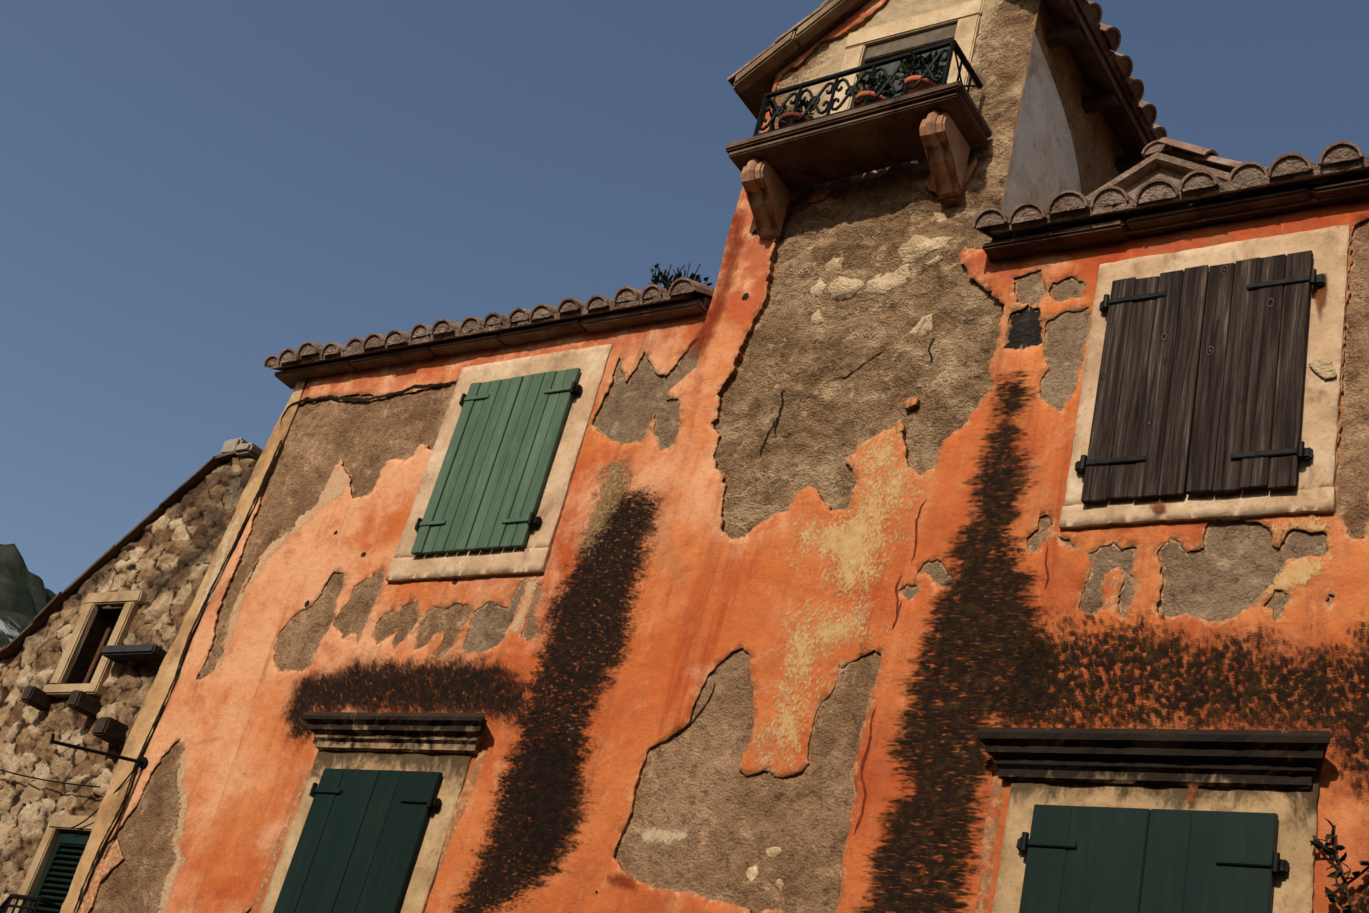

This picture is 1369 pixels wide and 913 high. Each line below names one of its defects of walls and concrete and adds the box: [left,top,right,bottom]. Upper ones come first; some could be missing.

spalling [198,383,456,680]
water stain [573,448,641,557]
spalling [593,342,700,450]
crack [760,389,785,455]
spalling [616,0,1091,913]
crack [829,349,885,381]
spalling [1158,221,1369,621]
spalling [274,565,542,671]
water stain [509,575,540,634]
spalling [77,740,188,913]
water stain [505,731,593,902]